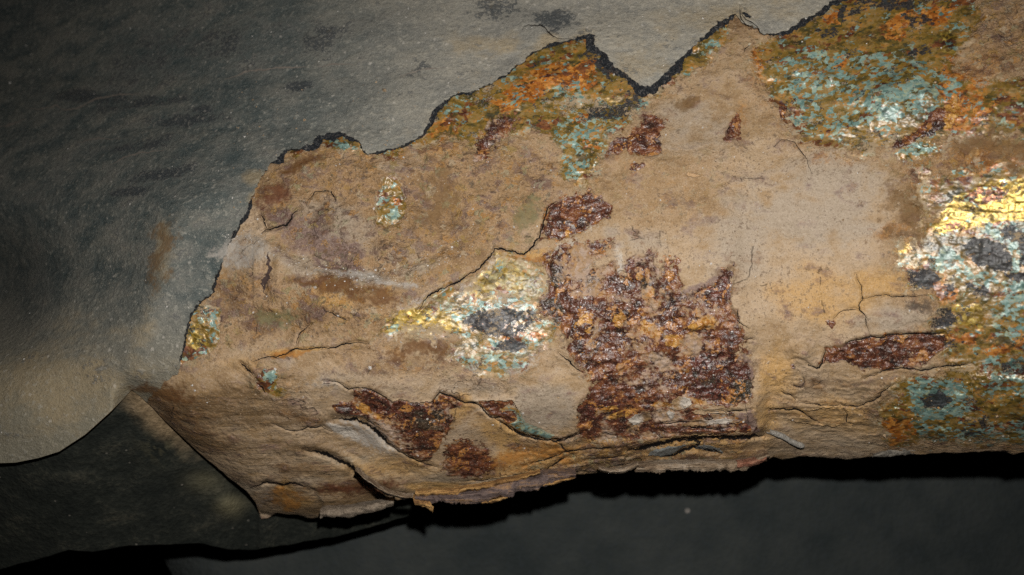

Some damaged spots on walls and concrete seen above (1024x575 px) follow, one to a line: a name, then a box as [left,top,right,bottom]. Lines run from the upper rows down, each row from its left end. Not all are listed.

rust [605,111,668,171]
rust [722,111,742,143]
crack [261,190,336,234]
crack [420,202,555,308]
peeling [270,0,1024,452]
peeling [179,300,221,364]
peeling [255,368,287,398]
crack [240,309,369,393]
rust [320,186,770,519]
crack [432,274,968,472]
rust [818,329,951,372]